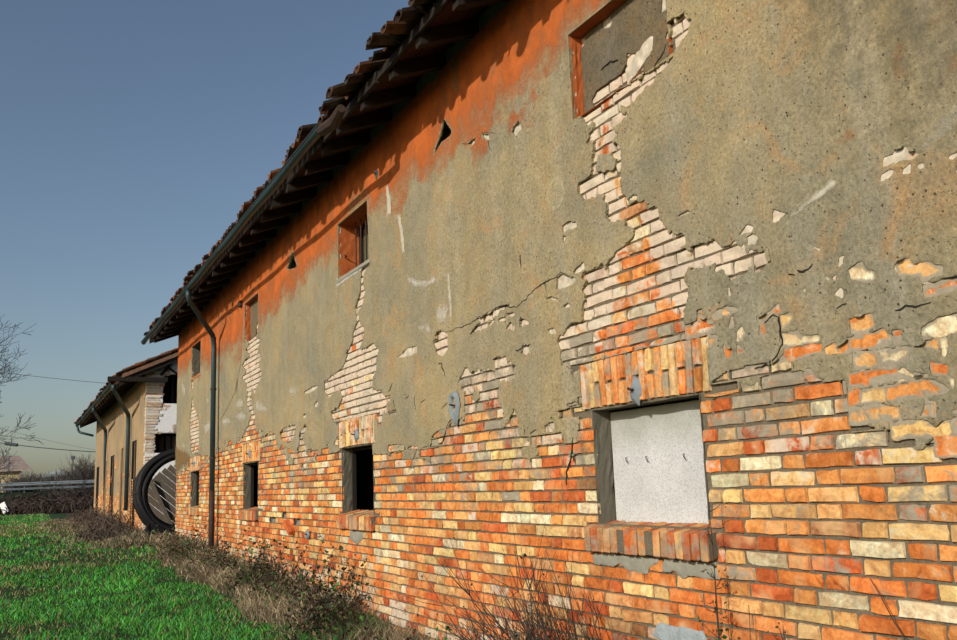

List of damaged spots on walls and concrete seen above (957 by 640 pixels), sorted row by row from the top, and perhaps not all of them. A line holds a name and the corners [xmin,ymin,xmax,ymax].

peeling [178,0,600,481]
spalling [548,0,771,377]
spalling [773,209,785,223]
spalling [880,145,924,181]
crack [447,272,571,332]
peeling [826,256,875,298]
peeling [895,257,957,299]
peeling [756,303,957,459]